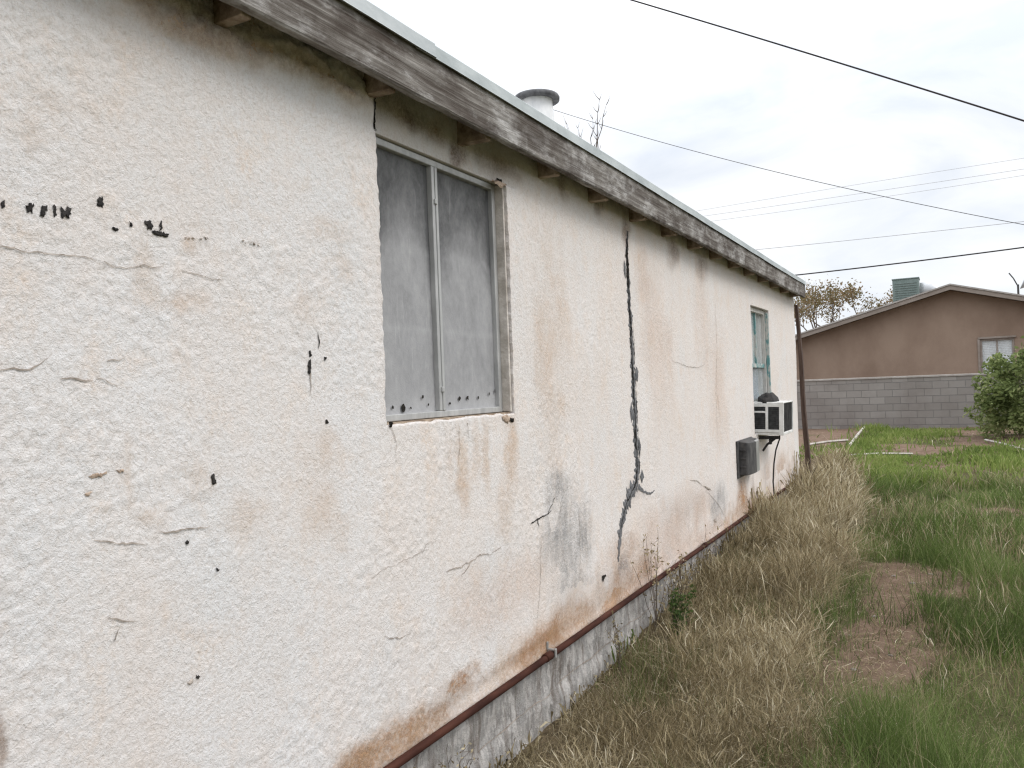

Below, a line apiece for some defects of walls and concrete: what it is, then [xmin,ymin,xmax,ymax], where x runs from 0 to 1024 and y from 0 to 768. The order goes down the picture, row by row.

peeling [25,203,72,219]
peeling [112,220,169,237]
crack [3,246,223,280]
crack [0,358,123,386]
crack [617,231,655,569]
crack [447,547,501,576]